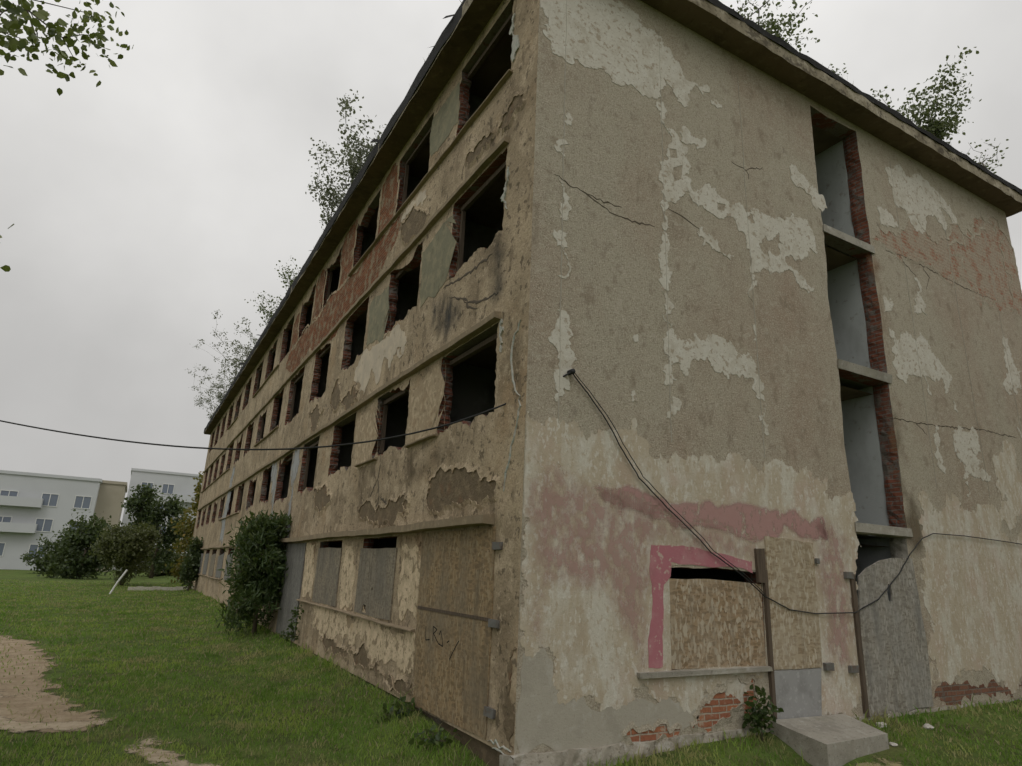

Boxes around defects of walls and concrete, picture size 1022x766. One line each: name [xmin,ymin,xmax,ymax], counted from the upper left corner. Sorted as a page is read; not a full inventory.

flaking render [285,159,430,470]
crack [554,174,699,229]
peeling [540,0,818,436]
peeling [789,164,827,212]
peeling [888,327,958,412]
flaking render [871,164,1022,321]
peeling [302,542,415,698]
spalling [357,491,411,539]
peeling [397,542,421,621]
spalling [426,462,501,518]
peeling [502,411,862,748]
peeling [918,425,1022,706]